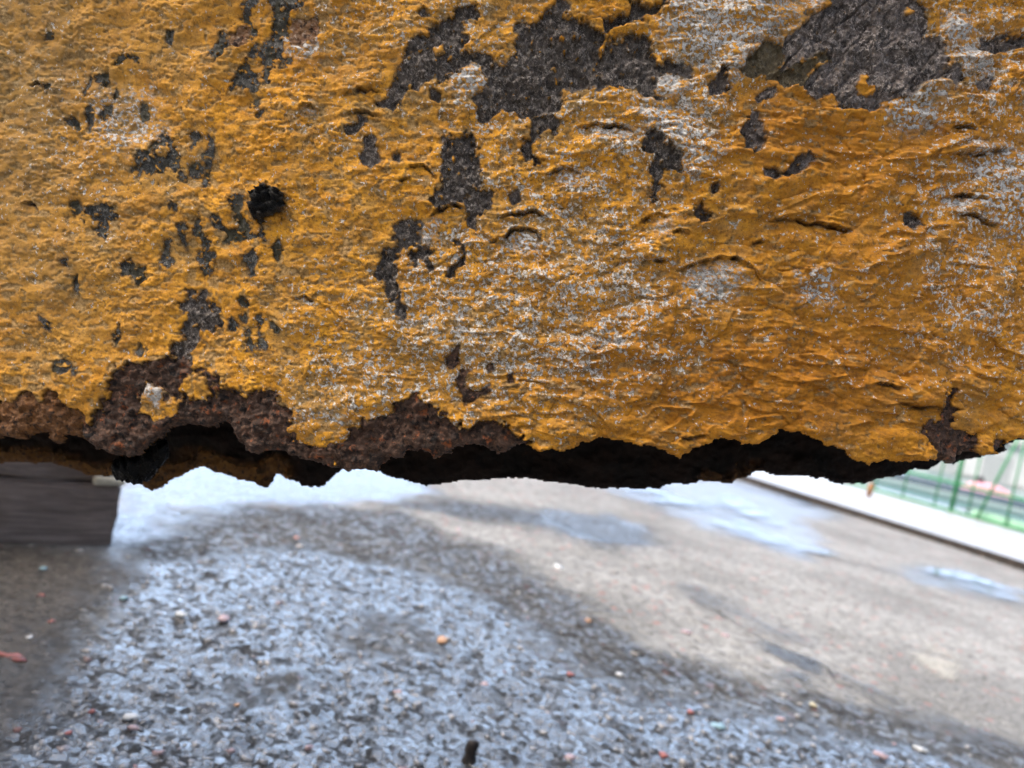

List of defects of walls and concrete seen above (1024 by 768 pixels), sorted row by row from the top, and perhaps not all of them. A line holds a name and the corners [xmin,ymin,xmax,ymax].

peeling [207,0,320,118]
peeling [376,0,693,166]
peeling [780,0,964,112]
peeling [131,131,215,188]
peeling [642,130,683,203]
peeling [120,258,147,285]
peeling [159,181,287,278]
peeling [374,132,494,322]
peeling [52,359,78,376]
peeling [170,289,280,363]
rust [0,344,532,491]
rust [921,388,980,464]